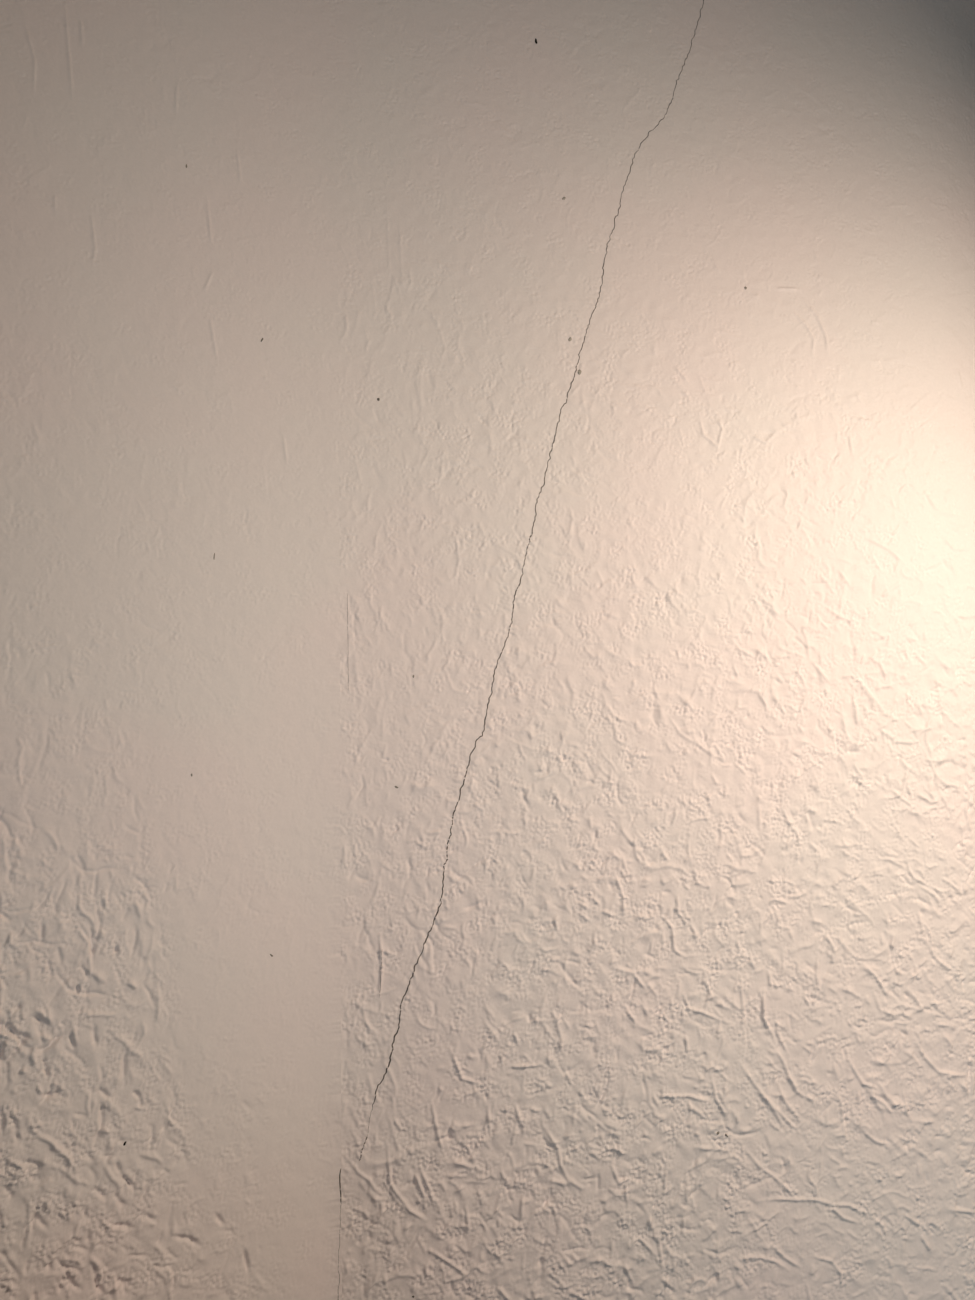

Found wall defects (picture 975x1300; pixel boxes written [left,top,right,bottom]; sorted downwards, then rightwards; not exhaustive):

crack [338,0,704,1287]